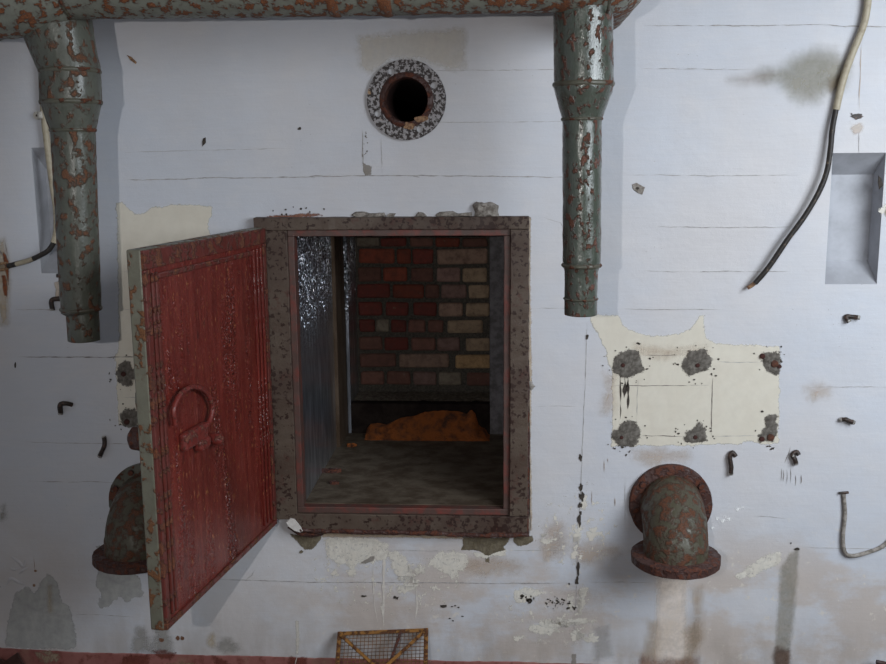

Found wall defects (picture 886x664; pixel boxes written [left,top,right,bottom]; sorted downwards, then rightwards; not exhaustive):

water stain [784,59,841,95]
rust [0,243,9,320]
peeling [109,202,212,430]
peeling [586,314,785,456]
peeling [286,483,617,664]
water stain [775,566,796,664]